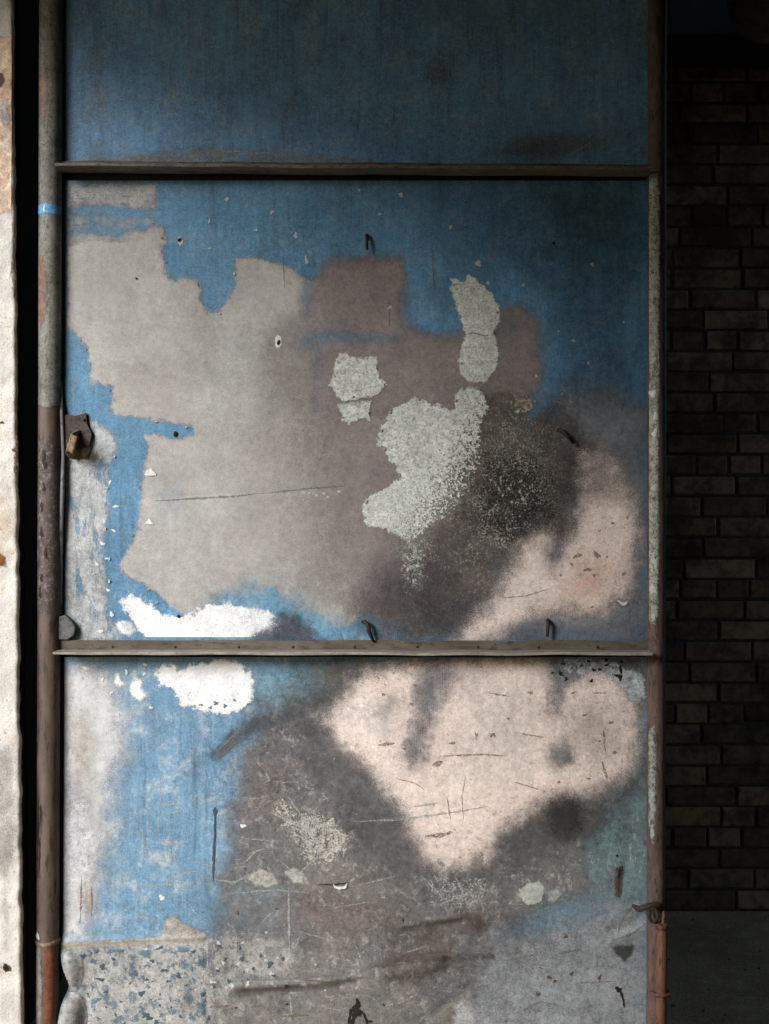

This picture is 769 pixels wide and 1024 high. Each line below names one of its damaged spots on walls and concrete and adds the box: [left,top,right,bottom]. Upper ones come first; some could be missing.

peeling [328,260,570,604]
corrosion [35,932,58,1024]